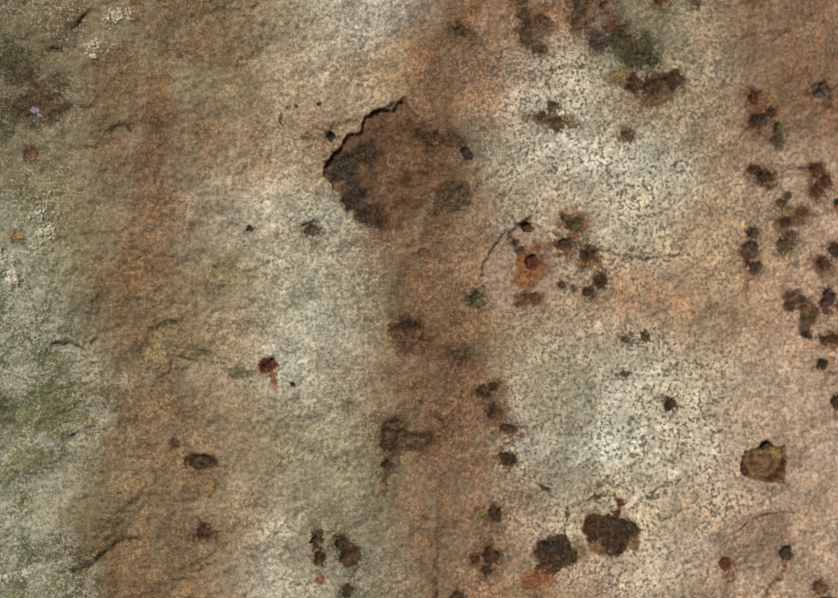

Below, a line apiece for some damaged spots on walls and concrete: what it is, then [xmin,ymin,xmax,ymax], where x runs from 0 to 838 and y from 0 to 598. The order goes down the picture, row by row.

spalling [322,96,473,247]
corrosion [227,353,290,389]
spalling [739,441,800,501]
spalling [520,493,641,589]
spalling [717,510,795,571]